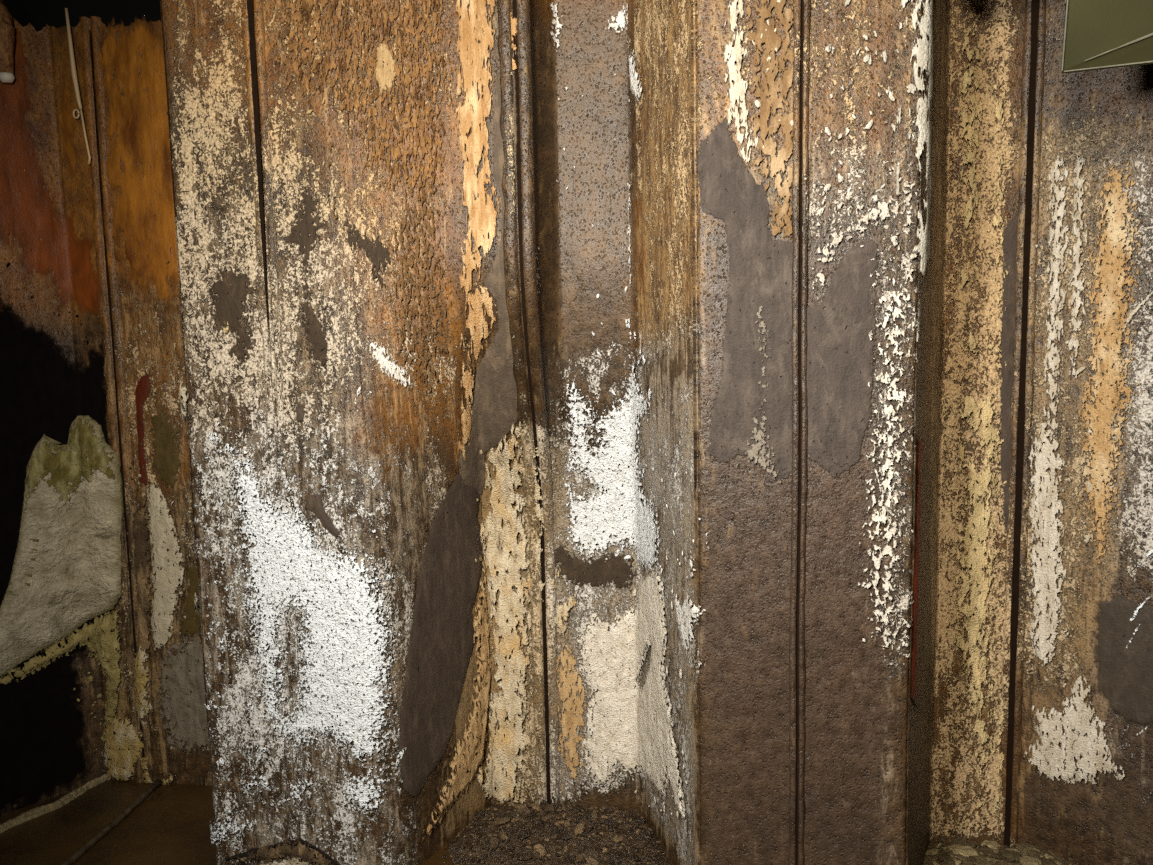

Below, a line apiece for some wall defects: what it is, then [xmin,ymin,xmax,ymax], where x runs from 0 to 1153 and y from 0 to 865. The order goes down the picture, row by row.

corrosion [98,19,179,298]
leakage [205,422,406,820]
peeling [399,0,518,797]
leakage [416,319,687,846]
leakage [629,50,642,101]
peeling [696,0,801,479]
peeling [813,160,862,226]
leakage [210,805,258,848]